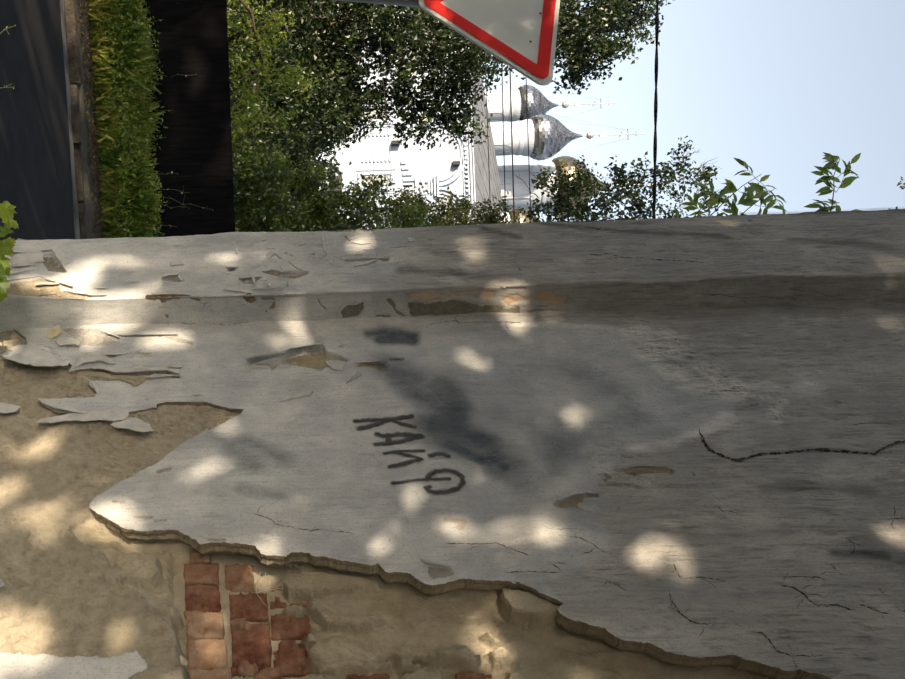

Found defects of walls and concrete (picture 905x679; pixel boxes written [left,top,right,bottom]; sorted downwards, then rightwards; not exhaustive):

peeling [6,238,107,299]
peeling [145,294,200,303]
peeling [226,239,308,312]
crack [693,423,905,463]
flaking render [0,325,831,679]
crack [665,563,725,637]
crack [783,538,905,619]
crack [755,632,823,672]